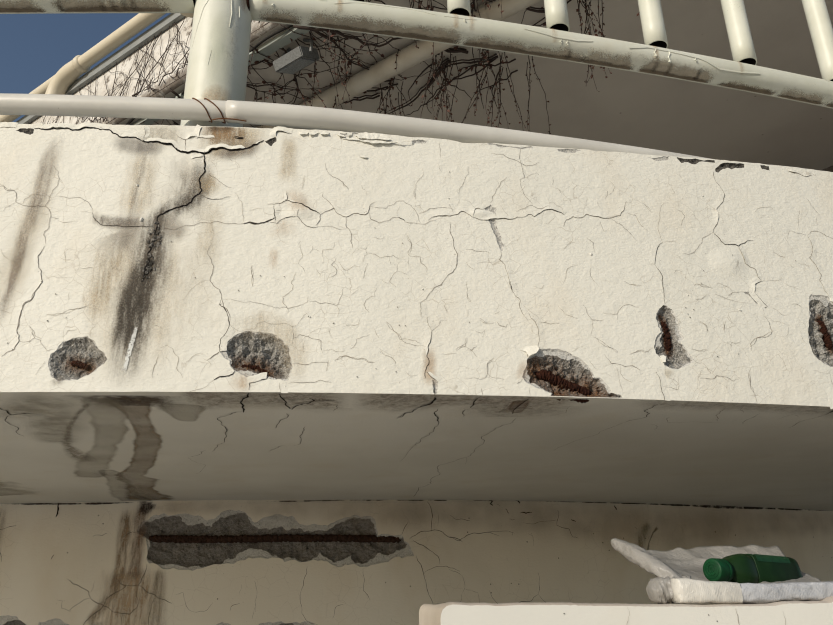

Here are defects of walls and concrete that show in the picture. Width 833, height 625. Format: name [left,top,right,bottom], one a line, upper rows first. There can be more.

water stain [7,231,28,296]
water stain [117,209,168,372]
crack [0,122,833,472]
spalling [48,336,107,382]
spalling [220,331,293,381]
spalling [520,345,623,403]
spalling [808,295,833,367]
water stain [24,396,171,517]
crack [402,383,577,604]
water stain [585,502,806,511]
spalling [136,510,414,571]
crack [61,568,257,625]